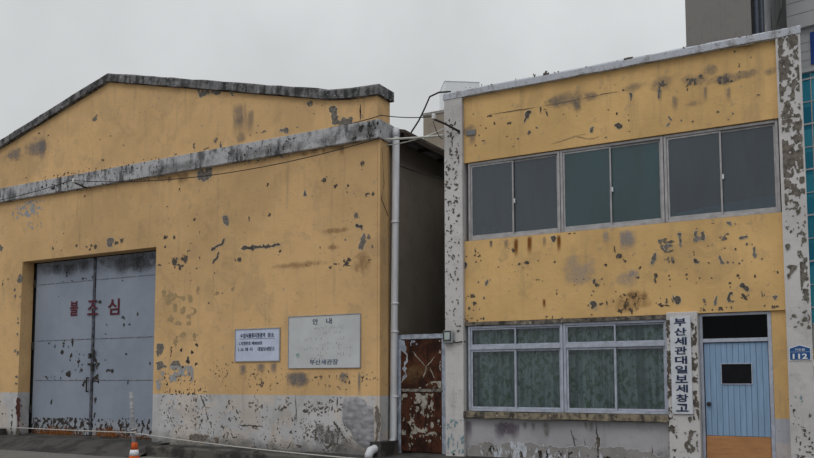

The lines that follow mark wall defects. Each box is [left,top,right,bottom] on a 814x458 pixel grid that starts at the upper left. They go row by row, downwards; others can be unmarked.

peeling [12,157,162,230]
spalling [196,167,213,182]
spalling [193,127,298,164]
peeling [444,118,485,332]
peeling [734,26,811,329]
peeling [2,280,242,447]
peeling [240,368,378,454]
spalling [401,340,663,458]
peeling [574,278,644,315]
peeling [666,221,763,458]